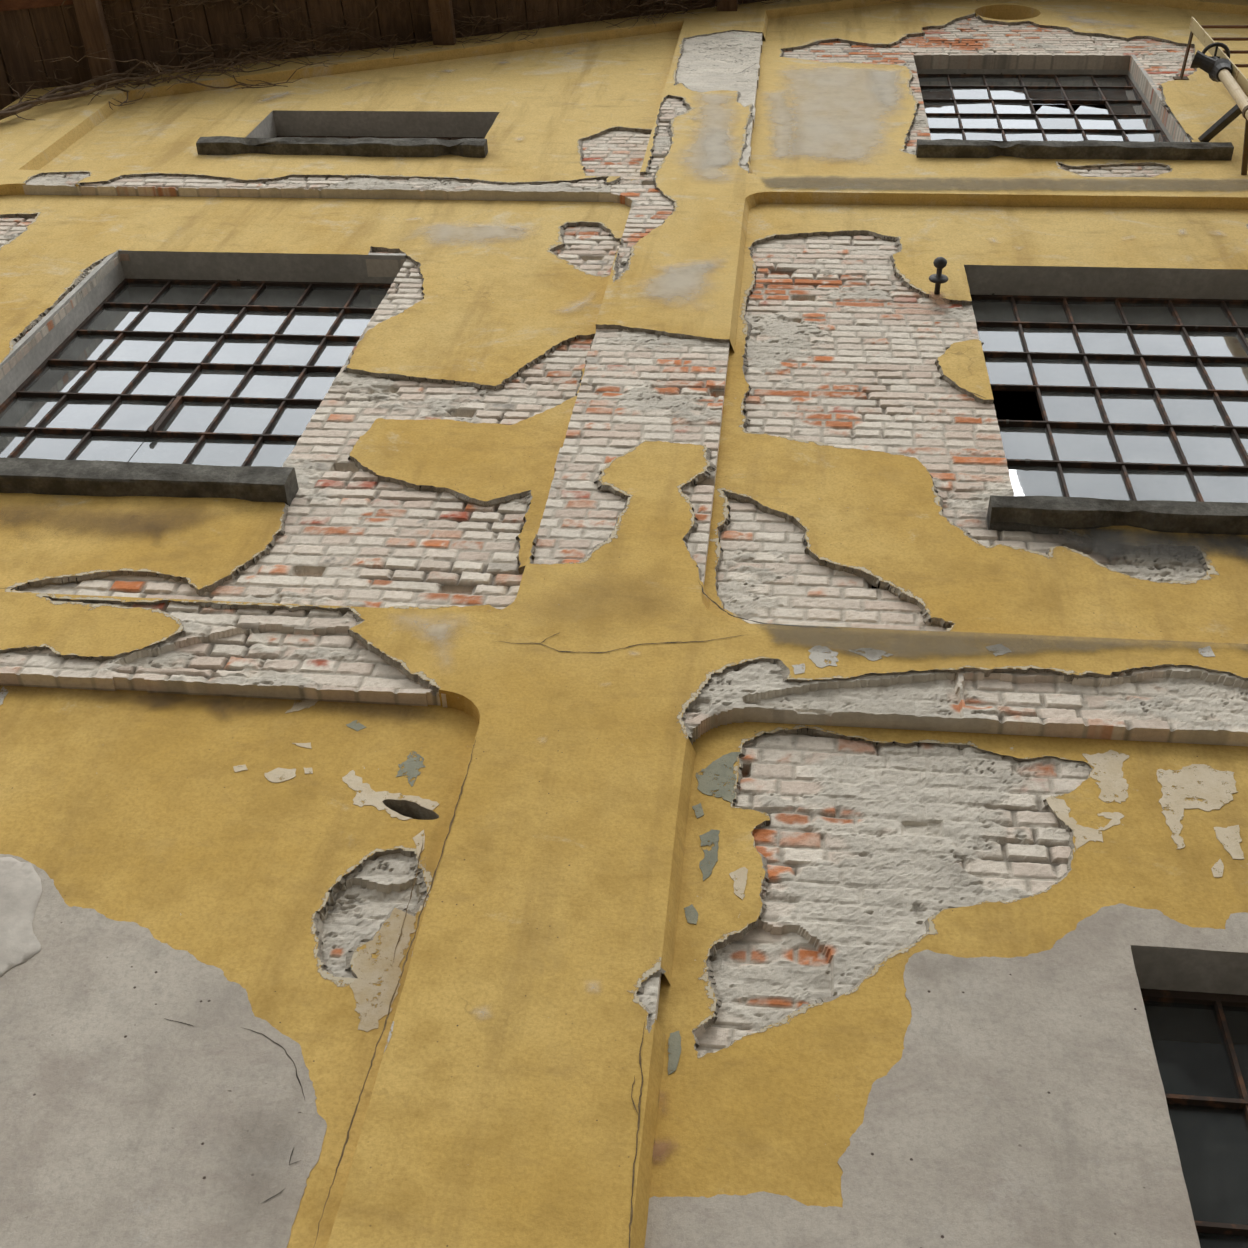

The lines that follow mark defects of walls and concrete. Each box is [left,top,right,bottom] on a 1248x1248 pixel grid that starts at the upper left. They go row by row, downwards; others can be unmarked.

flaking render [780,13,1197,155]
flaking render [0,212,41,250]
flaking render [22,30,763,282]
flaking render [1056,161,1172,178]
flaking render [0,230,1219,713]
water stain [1006,522,1248,560]
crack [500,584,772,653]
peeling [264,767,313,783]
peeling [0,854,327,1248]
flaking render [311,751,439,1052]
flaking render [629,957,666,1033]
peeling [644,645,1248,1248]